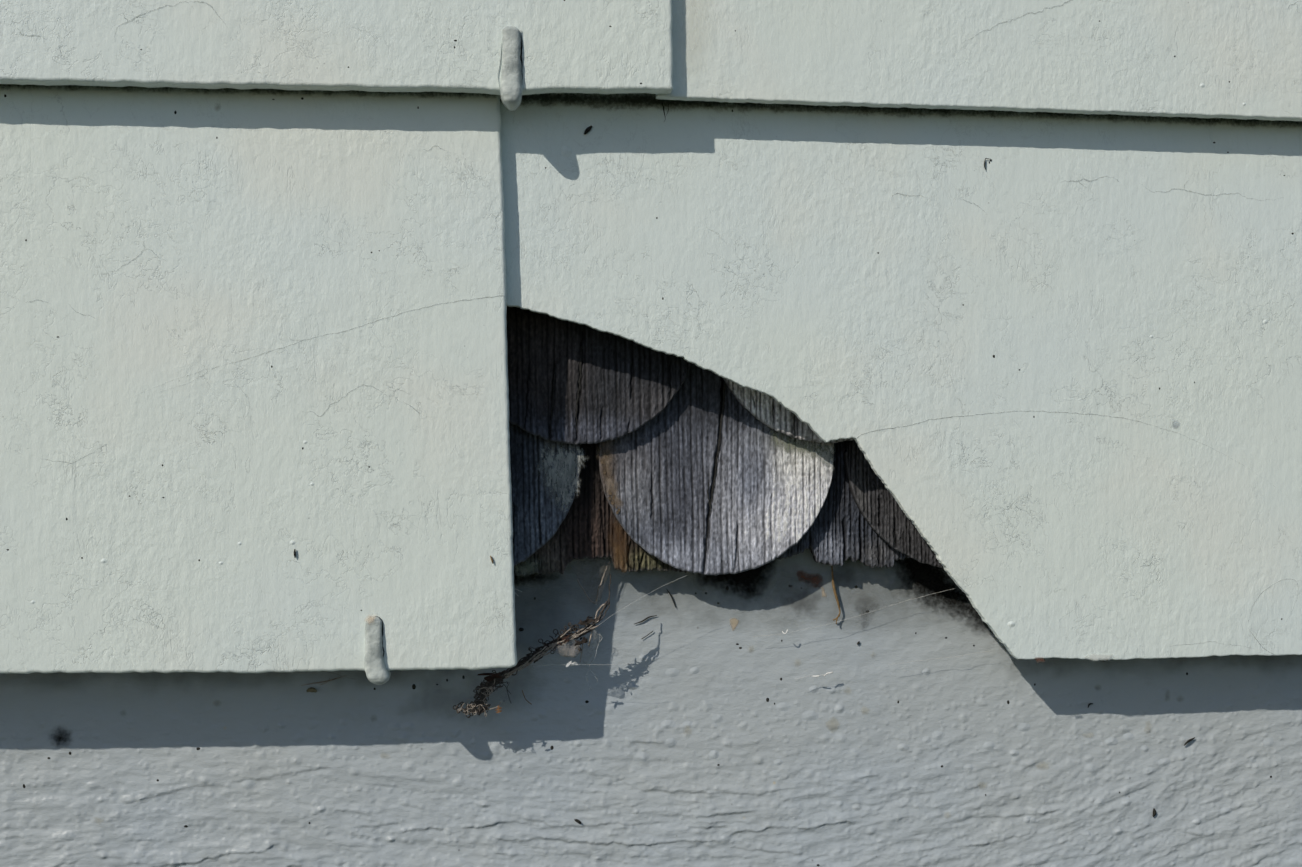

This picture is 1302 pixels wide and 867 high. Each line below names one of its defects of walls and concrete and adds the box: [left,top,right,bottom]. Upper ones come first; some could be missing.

peeling [539,447,621,514]